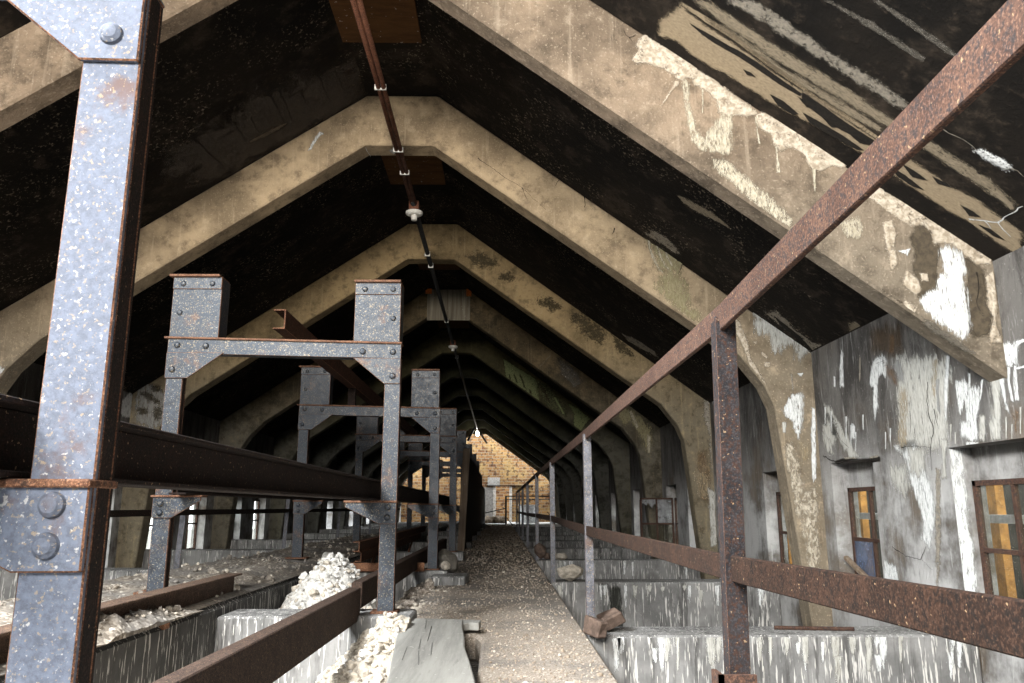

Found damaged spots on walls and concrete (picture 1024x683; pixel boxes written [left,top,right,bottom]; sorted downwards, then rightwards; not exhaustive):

leakage [827,0,925,61]
leakage [876,0,956,57]
leakage [658,0,908,153]
leakage [713,159,793,226]
leakage [894,141,1023,252]
crack [969,206,1023,237]
leakage [465,250,515,283]
leakage [537,297,562,312]
leakage [571,312,659,360]
peeling [753,313,821,568]
crack [901,382,939,470]